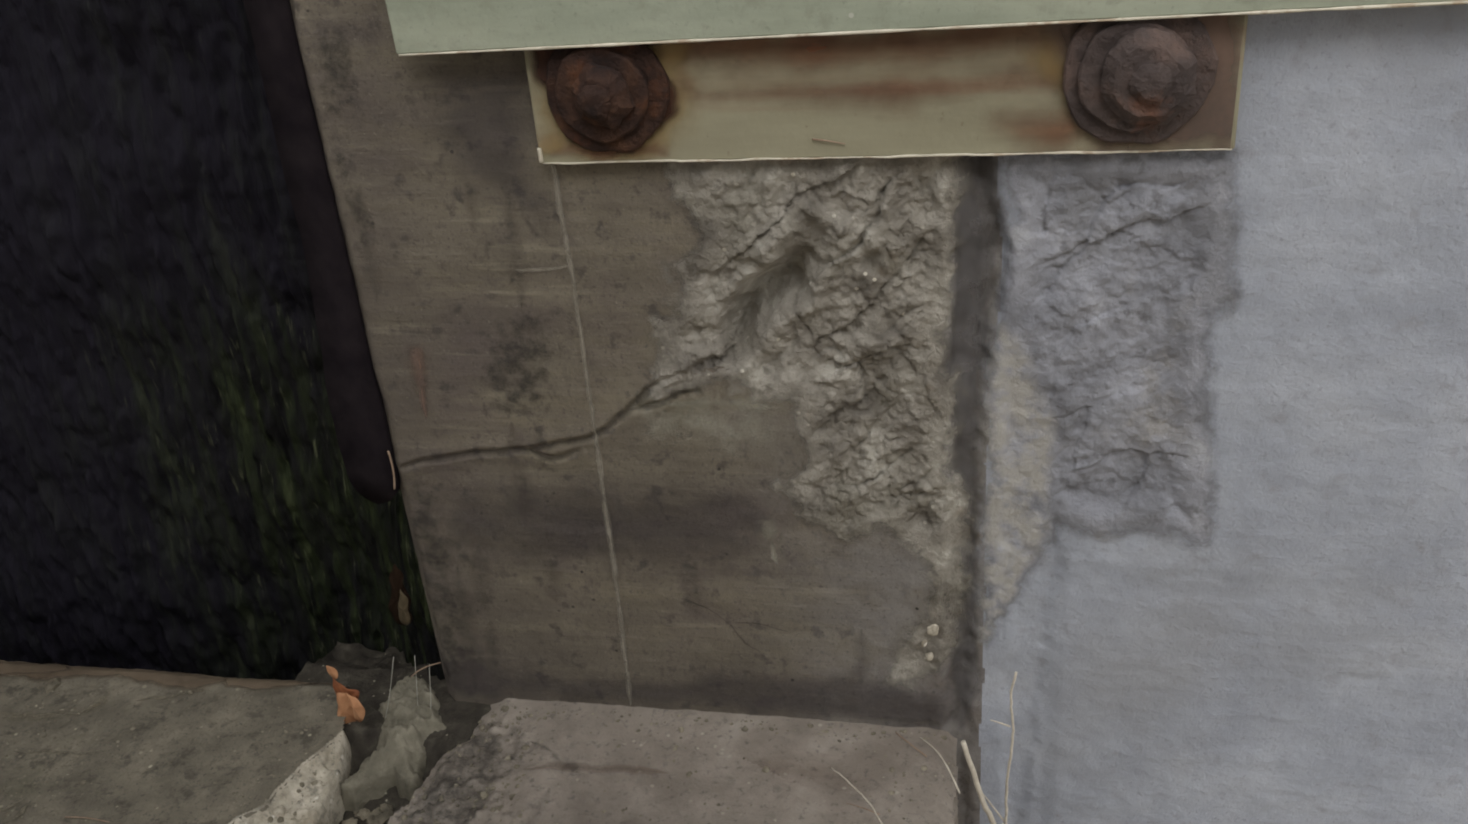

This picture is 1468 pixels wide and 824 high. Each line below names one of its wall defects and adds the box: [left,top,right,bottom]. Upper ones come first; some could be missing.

rust [532,49,555,85]
rust [574,22,1084,156]
rust [1103,13,1240,147]
spalling [647,151,1240,686]